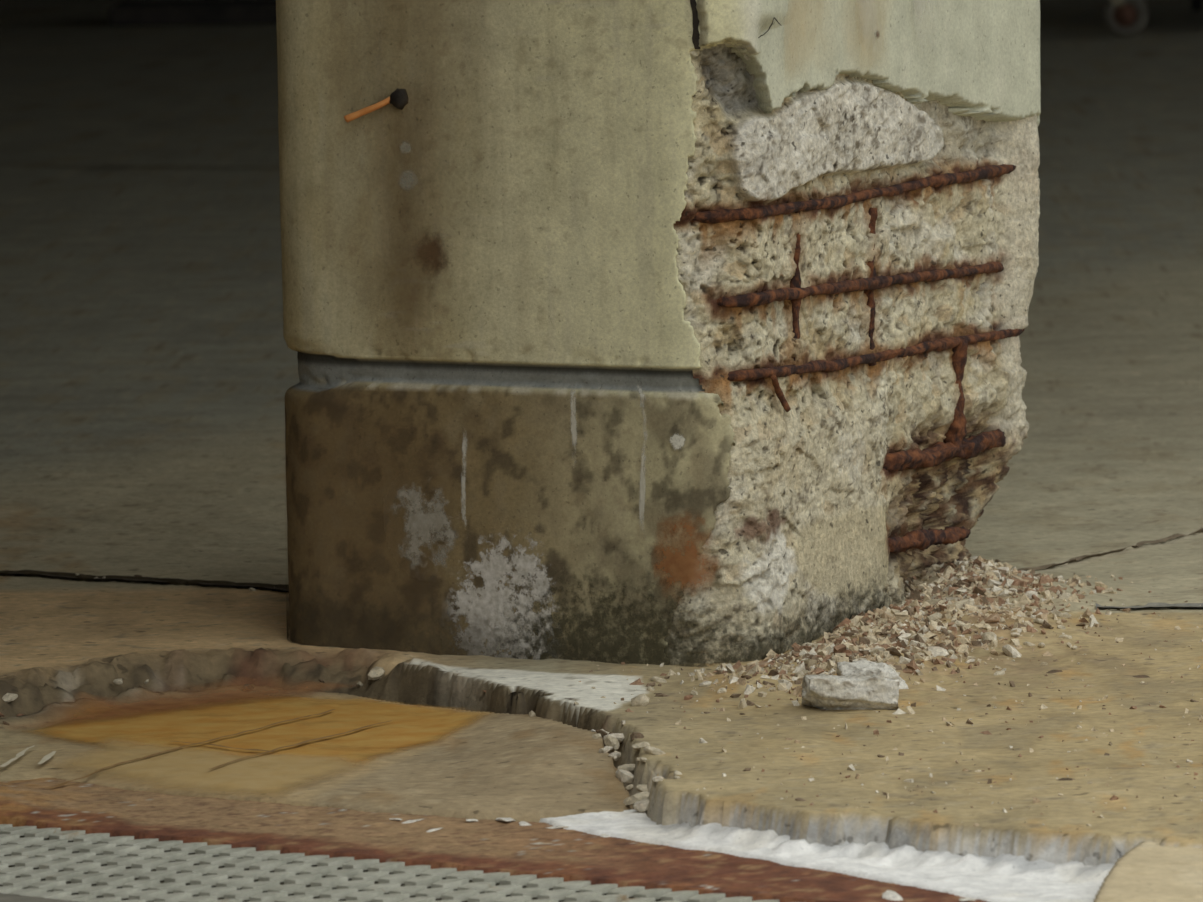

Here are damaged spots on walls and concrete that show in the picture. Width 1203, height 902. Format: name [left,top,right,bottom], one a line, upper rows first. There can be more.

crack [690,0,700,49]
spalling [664,0,1040,664]
water stain [395,440,466,565]
corrosion [655,517,717,588]
crack [1017,528,1203,571]
crack [50,709,389,788]